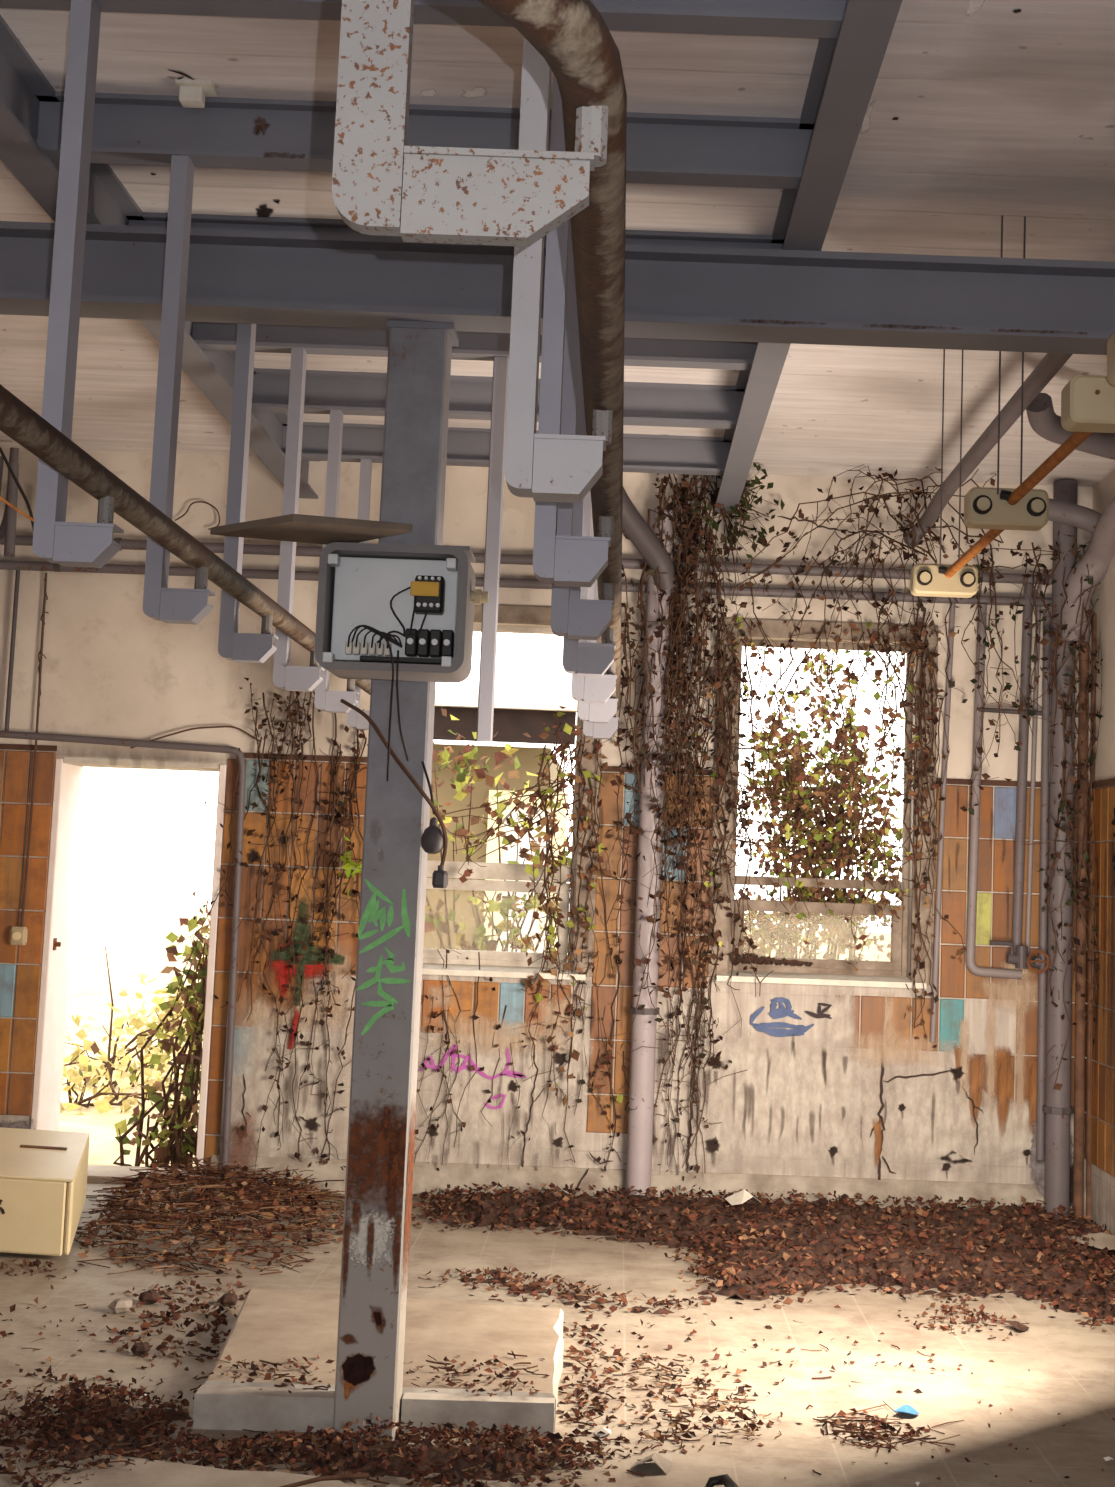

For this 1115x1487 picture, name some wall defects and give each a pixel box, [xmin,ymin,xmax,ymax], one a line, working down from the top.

peeling [706,992,928,1163]
peeling [891,1044,1045,1196]
rust [343,1104,417,1295]
rust [341,1334,375,1399]
rust [372,1309,385,1333]